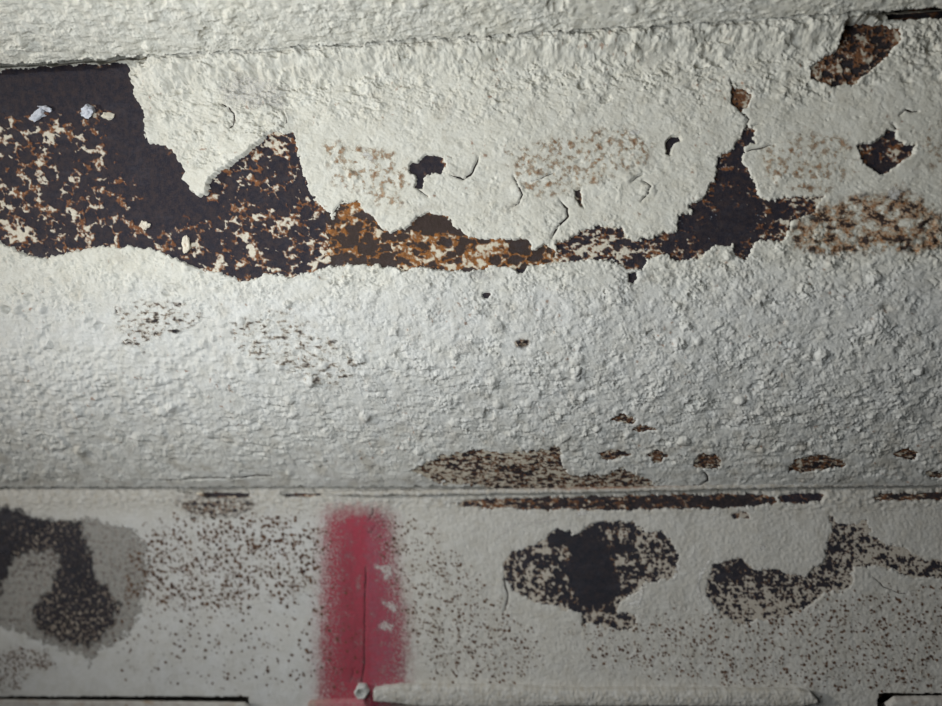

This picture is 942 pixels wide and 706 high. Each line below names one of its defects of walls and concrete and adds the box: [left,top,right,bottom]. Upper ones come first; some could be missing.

peeling [0,62,332,282]
corrosion [324,144,559,272]
corrosion [512,131,648,197]
peeling [554,125,824,270]
corrosion [763,134,852,192]
corrosion [792,190,942,256]
corrosion [411,445,777,519]
peeling [0,504,153,667]
peeling [503,520,679,631]
peeling [705,516,942,626]